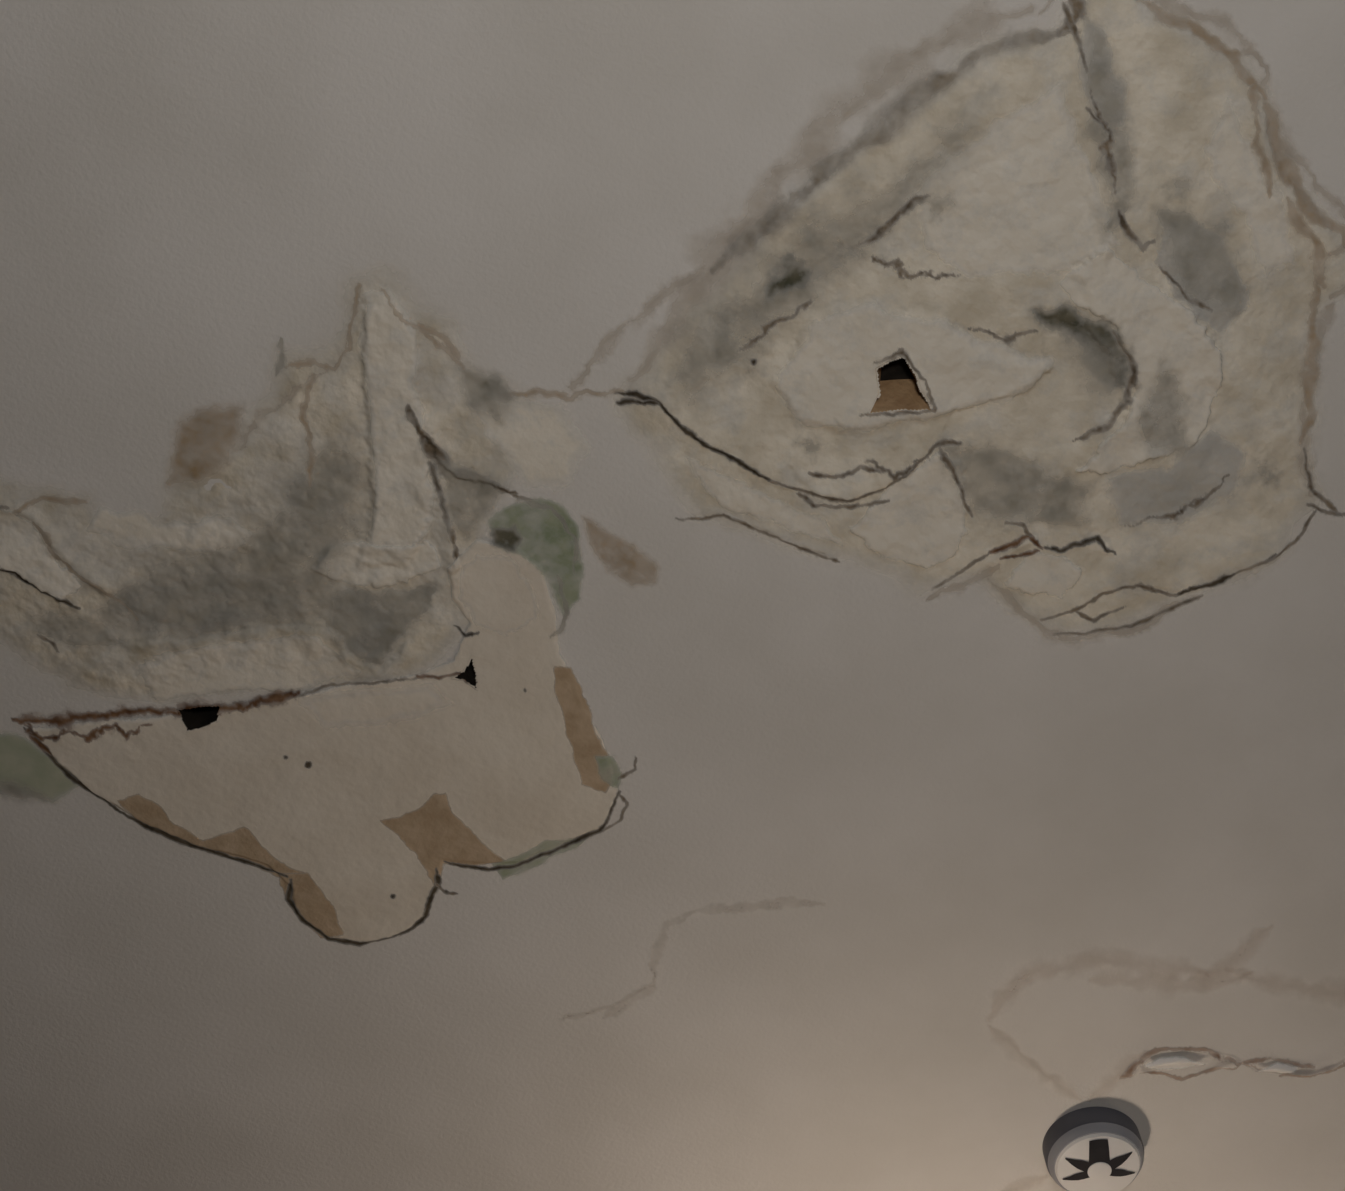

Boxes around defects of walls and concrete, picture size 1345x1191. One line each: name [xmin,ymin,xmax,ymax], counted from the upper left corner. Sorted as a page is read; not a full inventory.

spalling [861,348,937,417]
flaking render [0,498,621,942]